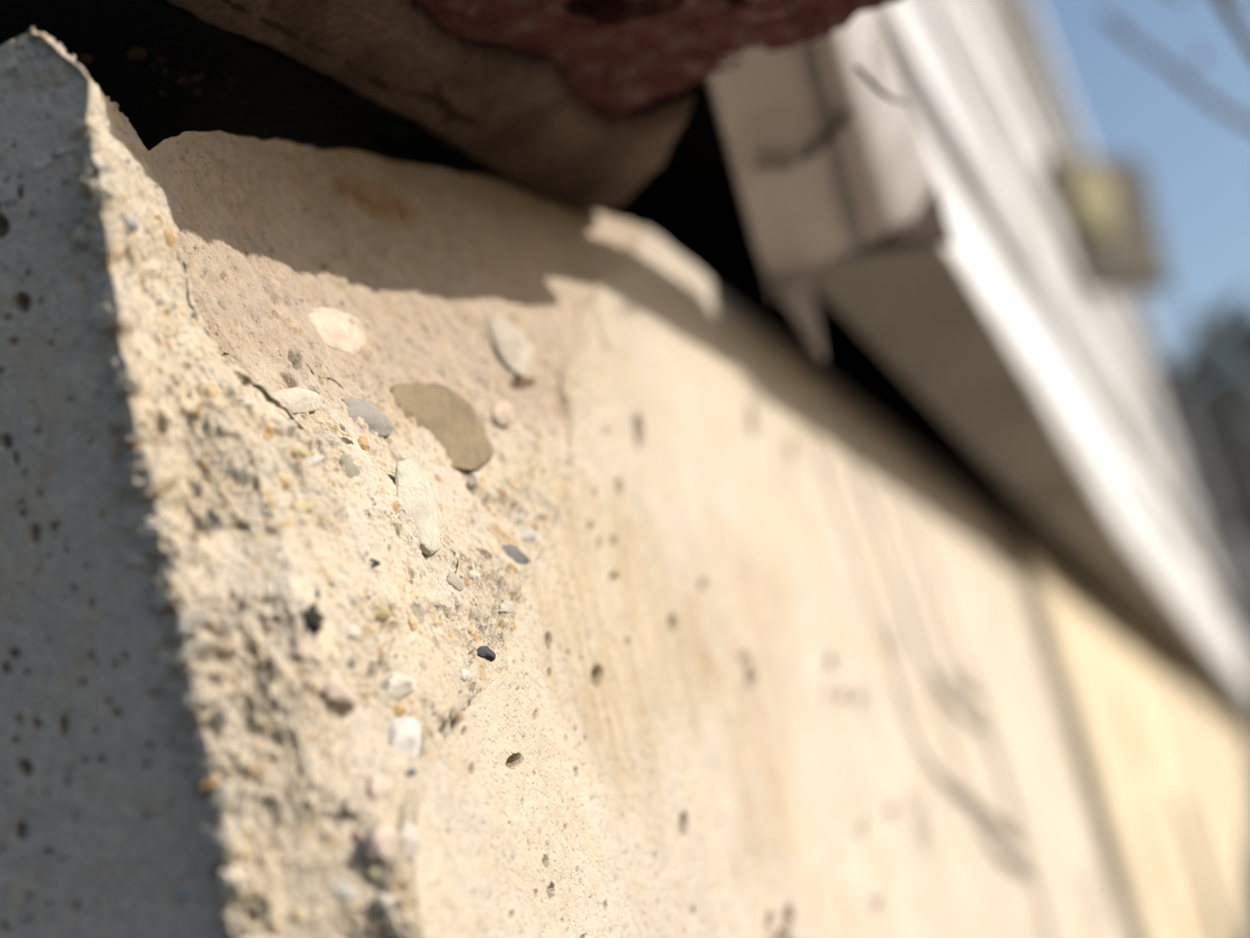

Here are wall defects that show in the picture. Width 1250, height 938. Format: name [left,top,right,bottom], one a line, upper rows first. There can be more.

spalling [0,26,652,938]